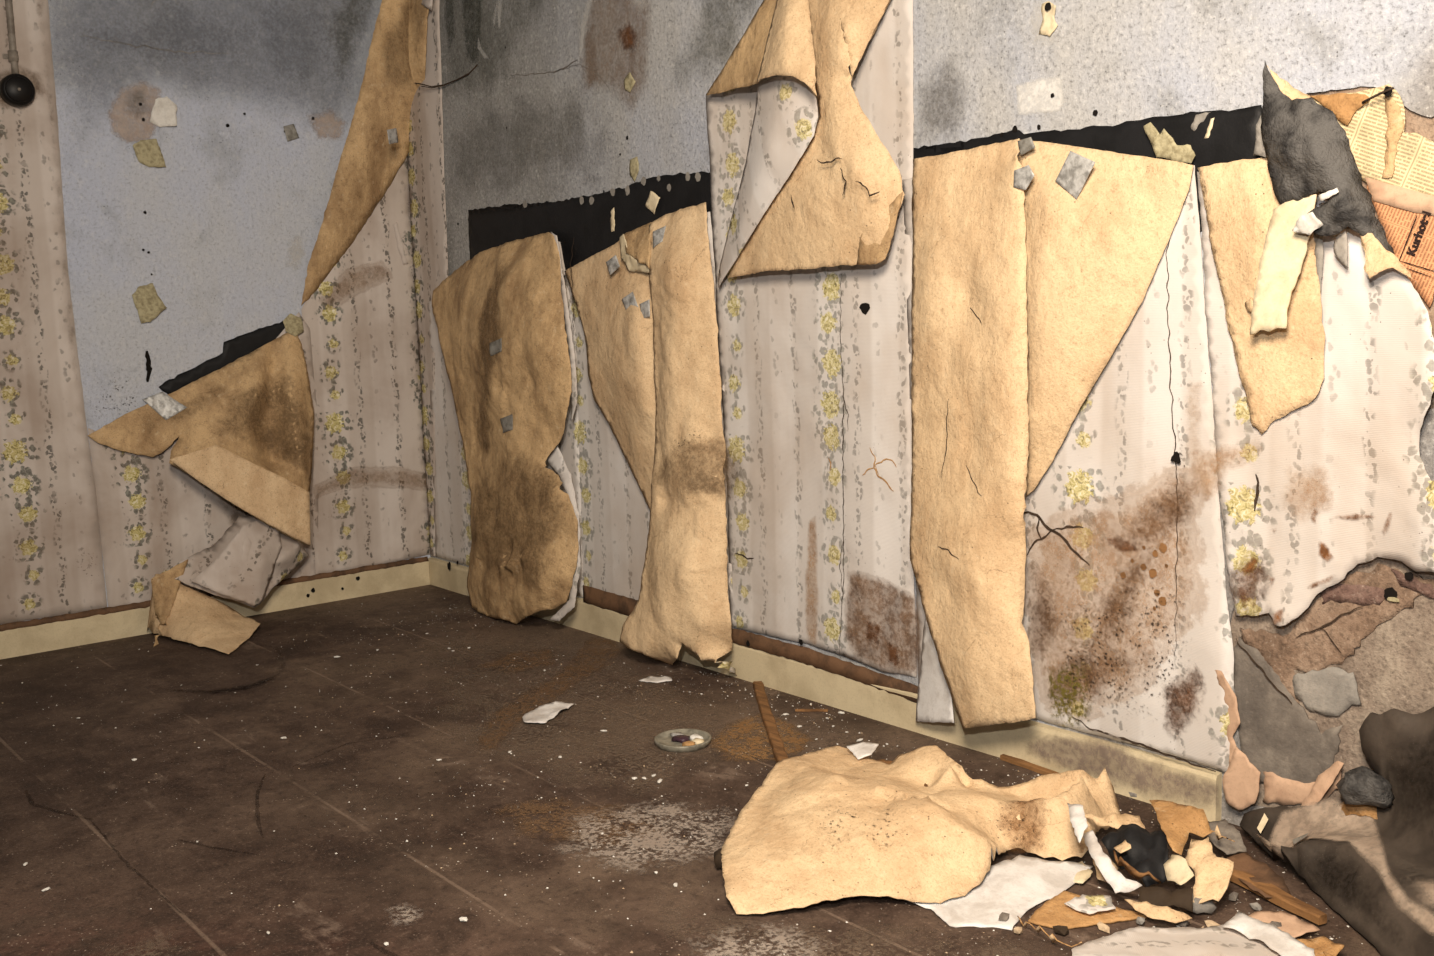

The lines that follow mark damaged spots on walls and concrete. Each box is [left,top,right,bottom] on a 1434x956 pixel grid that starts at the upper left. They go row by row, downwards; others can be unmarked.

flaking render [1308,86,1377,98]
flaking render [1404,106,1434,142]
flaking render [1419,294,1434,337]
damp [847,575,919,670]
damp [1033,452,1234,726]
flaking render [1230,557,1434,807]